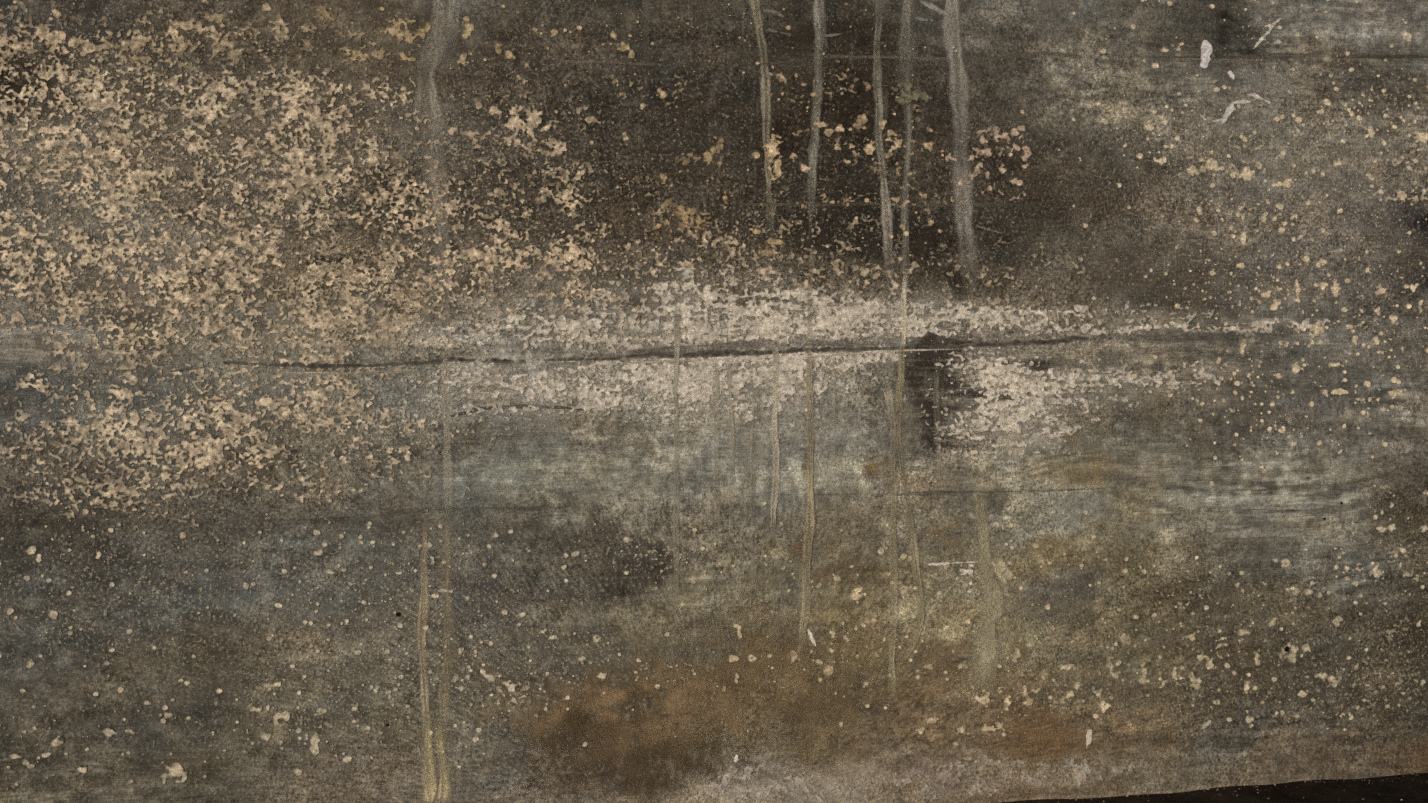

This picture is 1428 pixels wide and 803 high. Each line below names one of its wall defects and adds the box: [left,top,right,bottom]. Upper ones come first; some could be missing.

damp [749,0,789,216]
crack [170,332,1259,375]
damp [795,0,1013,683]
damp [417,528,452,802]